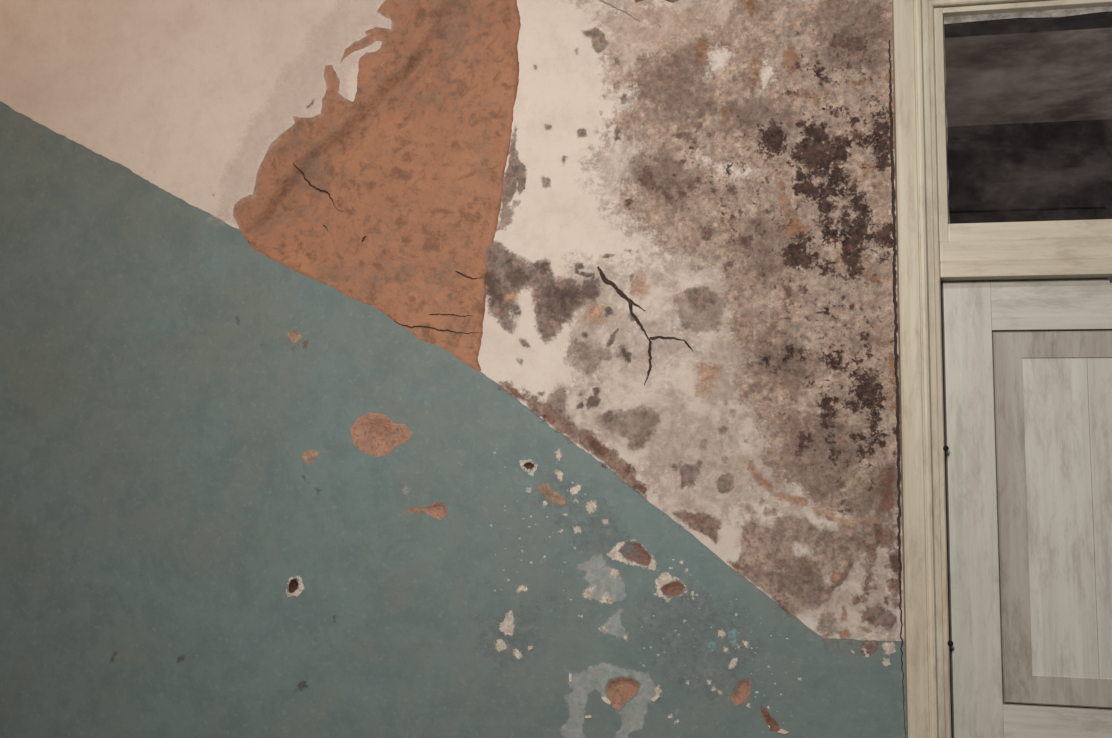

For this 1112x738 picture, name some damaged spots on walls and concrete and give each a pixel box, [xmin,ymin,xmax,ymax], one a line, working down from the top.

water stain [583,28,608,53]
spalling [233,0,521,371]
water stain [483,129,631,374]
crack [597,266,693,385]
water stain [607,0,901,638]
peeling [350,412,412,457]
water stain [539,388,658,448]
peeling [406,501,447,520]
peeling [576,539,695,641]
peeling [707,629,753,669]
peeling [560,662,662,738]
peeling [707,679,789,734]